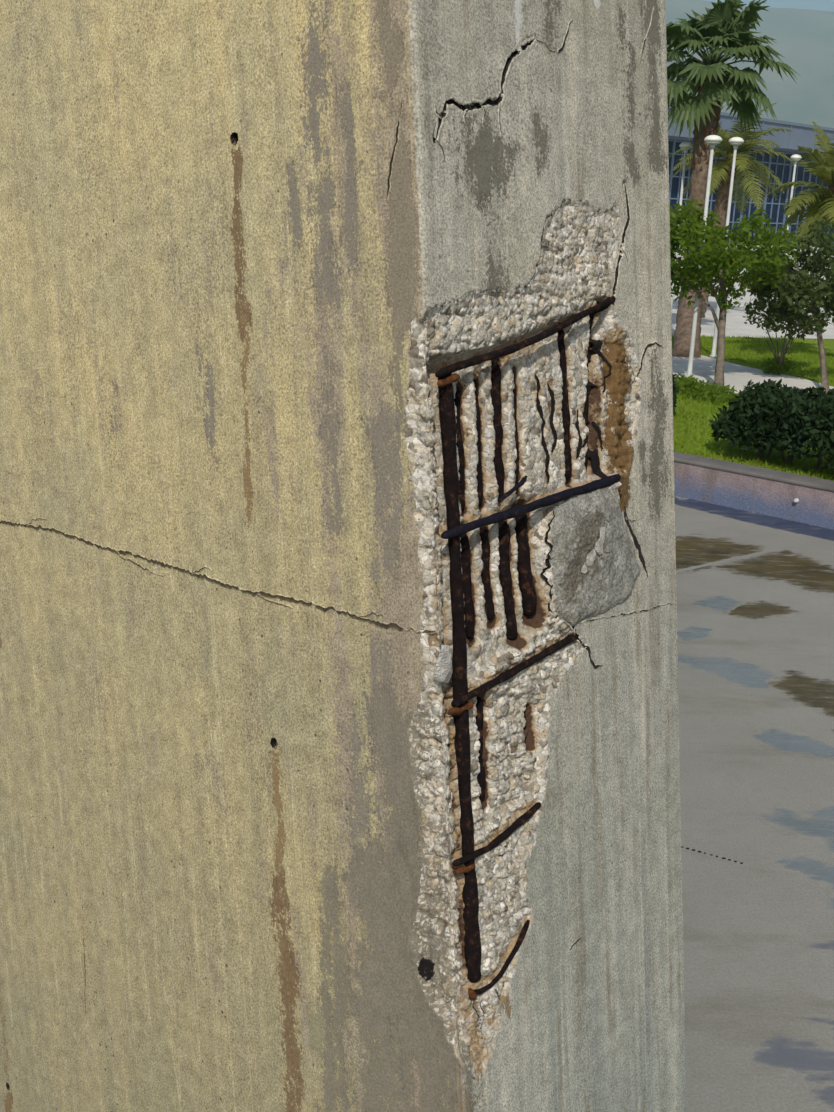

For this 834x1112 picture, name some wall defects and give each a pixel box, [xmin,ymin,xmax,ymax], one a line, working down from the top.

crack [433,19,573,167]
crack [0,517,439,636]
rust [230,141,253,528]
spalling [308,0,642,1112]
crack [535,183,675,670]
rust [599,338,637,513]
rust [0,990,13,1112]
rust [269,745,304,1112]